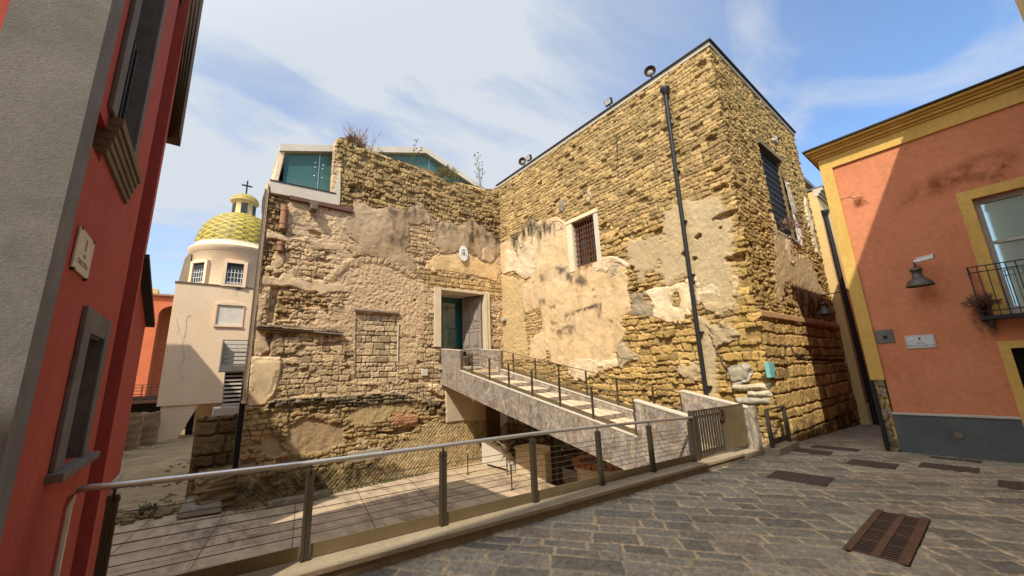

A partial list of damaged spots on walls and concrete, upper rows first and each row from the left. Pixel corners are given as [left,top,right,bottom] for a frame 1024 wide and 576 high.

peeling [247,198,631,406]
peeling [643,275,740,327]